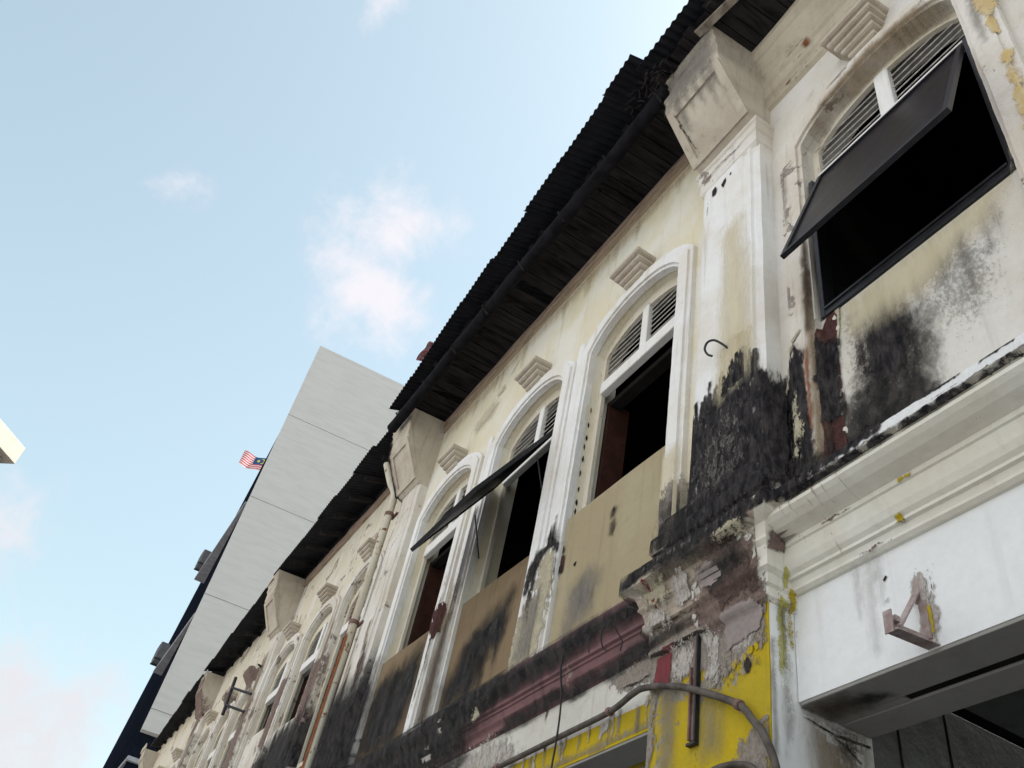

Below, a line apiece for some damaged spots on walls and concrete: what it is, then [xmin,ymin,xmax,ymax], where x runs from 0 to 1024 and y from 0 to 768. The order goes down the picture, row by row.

damp [622,227,824,590]
peeling [755,307,1024,503]
damp [845,185,999,439]
damp [458,621,504,692]
flaking render [608,517,794,768]